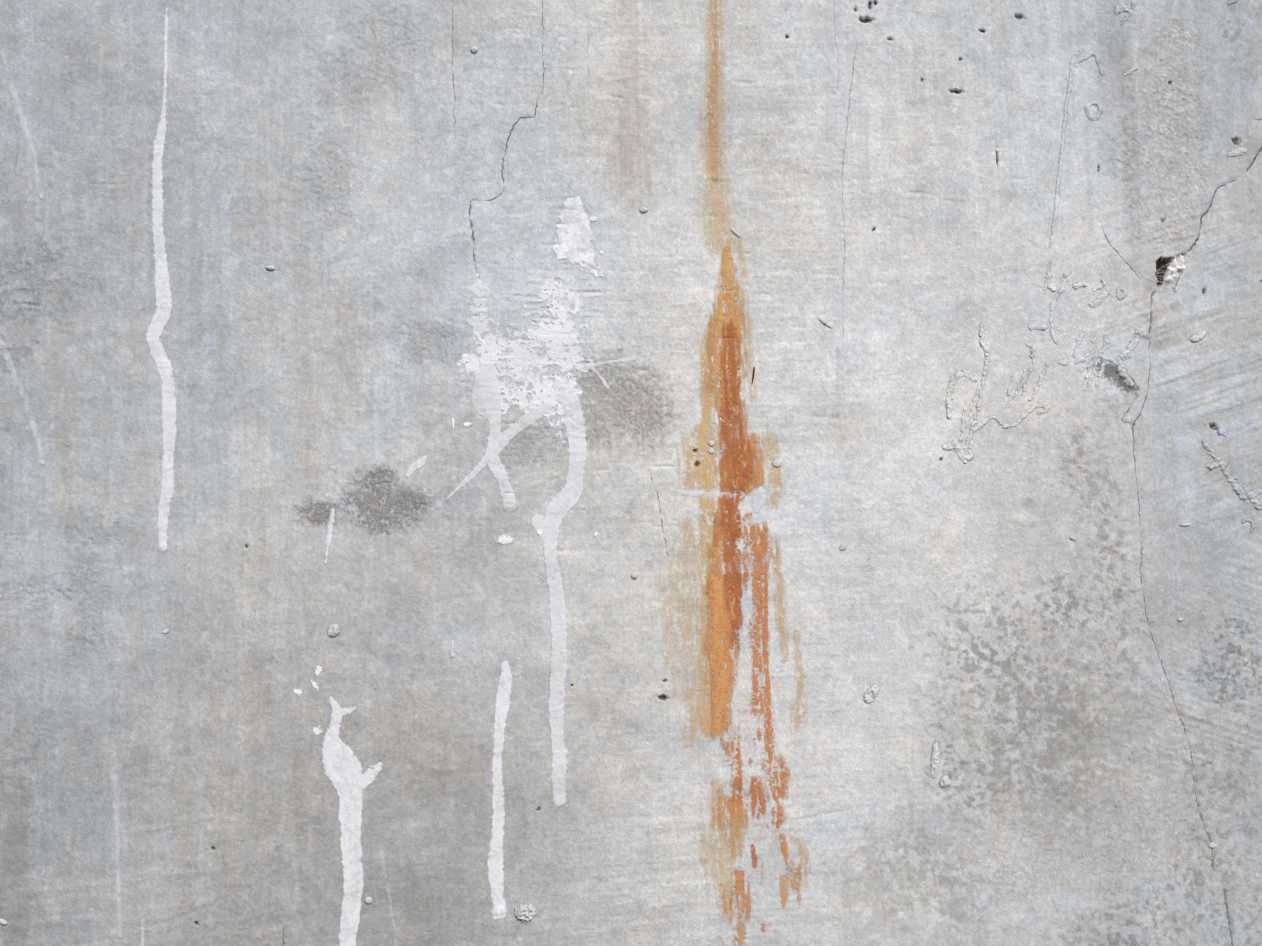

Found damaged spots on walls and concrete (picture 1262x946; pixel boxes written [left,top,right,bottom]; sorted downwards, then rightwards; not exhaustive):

crack [1181,147,1262,256]
hole [1155,250,1188,292]
corrosion [685,0,801,946]